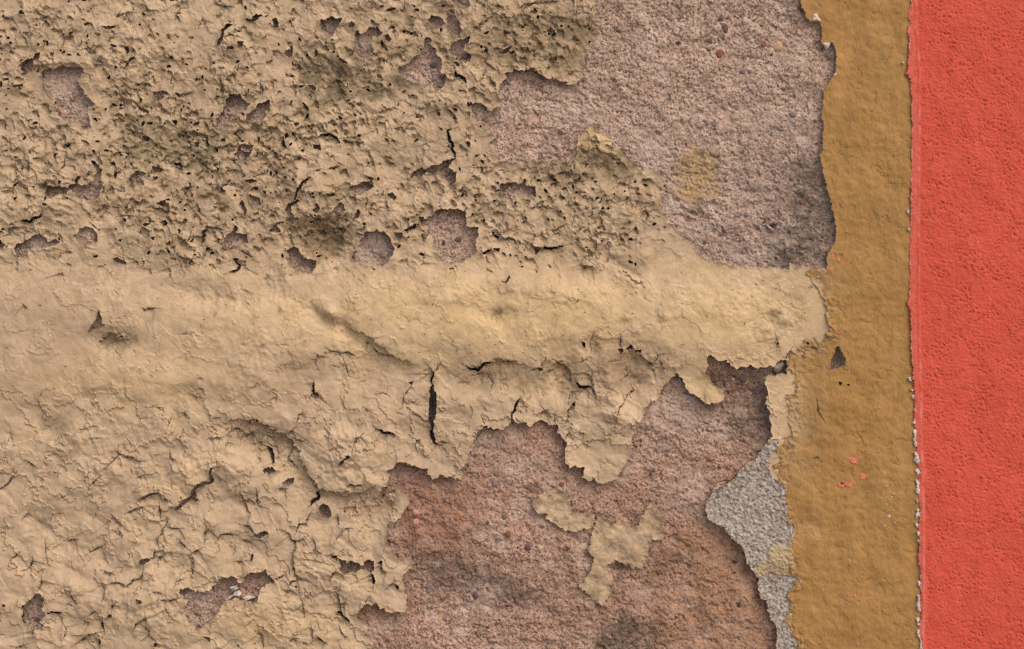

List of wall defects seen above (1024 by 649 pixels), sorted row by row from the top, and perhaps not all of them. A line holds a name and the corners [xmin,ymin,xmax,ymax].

spalling [217,6,291,52]
spalling [315,8,352,53]
spalling [20,23,122,127]
spalling [195,62,304,194]
spalling [352,0,836,271]
spalling [33,140,127,201]
spalling [0,228,60,257]
spalling [281,246,322,273]
crack [0,0,701,649]
spalling [357,355,801,649]
spalling [22,593,48,630]
spalling [179,569,275,629]